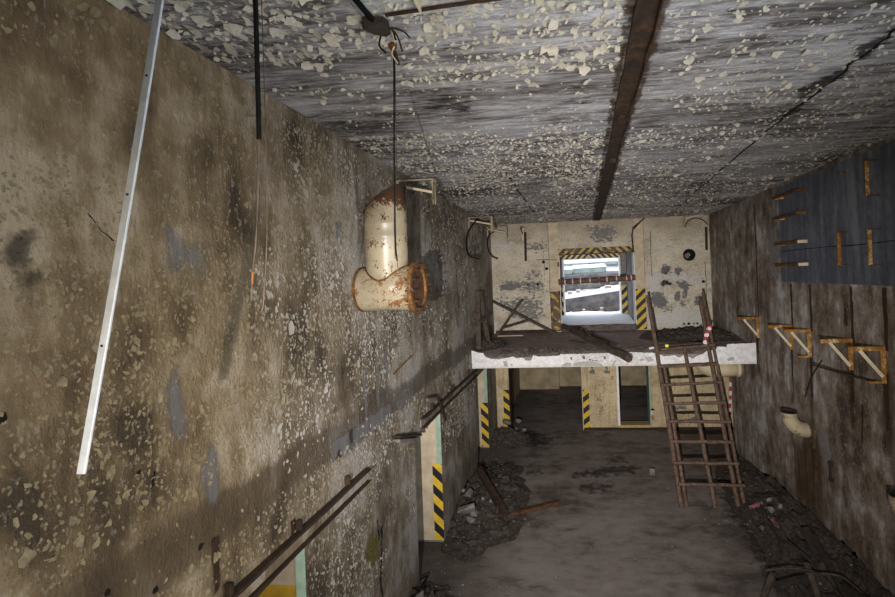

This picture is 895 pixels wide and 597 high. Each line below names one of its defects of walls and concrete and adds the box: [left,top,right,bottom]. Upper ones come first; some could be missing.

peeling [106,0,155,18]
peeling [160,0,626,107]
crack [668,28,895,217]
peeling [345,0,895,365]
spalling [472,343,738,374]
corrosion [883,374,892,452]
peeling [157,355,478,597]